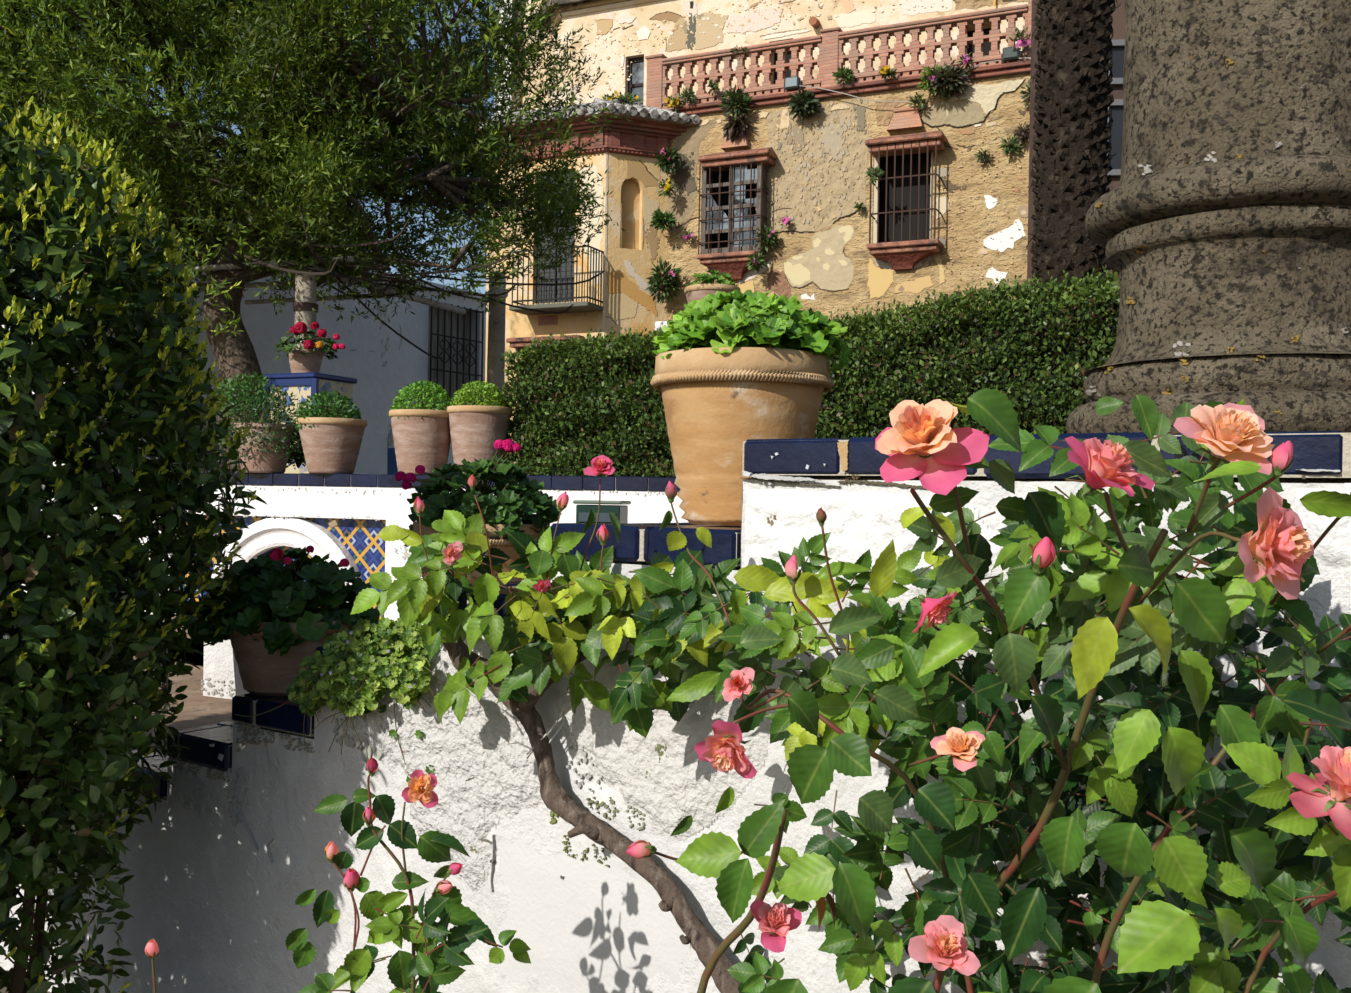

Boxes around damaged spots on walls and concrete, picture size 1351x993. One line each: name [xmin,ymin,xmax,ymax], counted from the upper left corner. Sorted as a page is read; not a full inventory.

flaking render [615,0,698,41]
peeling [726,2,811,40]
peeling [818,0,877,28]
crack [921,79,1025,149]
flaking render [738,224,855,306]
peeling [979,210,1027,284]